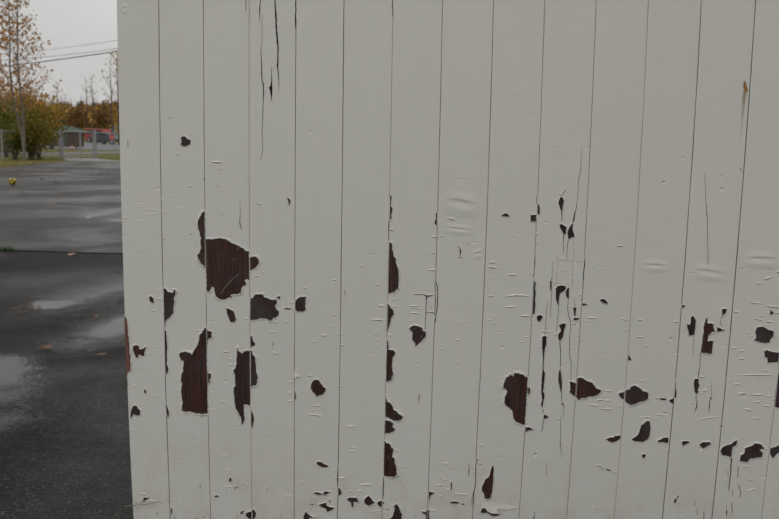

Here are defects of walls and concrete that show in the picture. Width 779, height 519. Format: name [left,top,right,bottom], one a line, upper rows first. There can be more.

crack [245,0,297,161]
peeling [149,286,215,417]
peeling [231,335,260,428]
peeling [195,209,308,323]
peeling [385,241,401,383]
peeling [383,394,404,479]
peeling [500,277,588,432]
peeling [557,367,603,406]
peeling [605,419,669,459]
peeling [617,379,677,407]
peeling [680,439,779,464]
peeling [753,325,779,409]